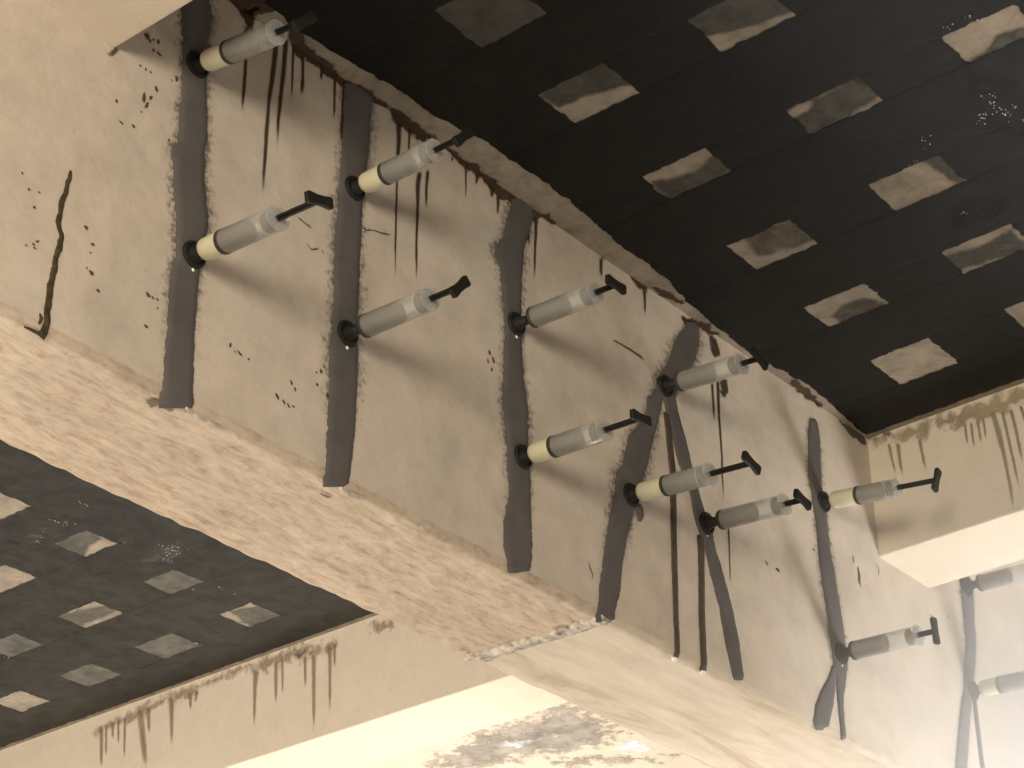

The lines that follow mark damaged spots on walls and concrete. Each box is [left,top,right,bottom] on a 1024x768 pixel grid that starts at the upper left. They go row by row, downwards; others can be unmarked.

rust [231,0,275,32]
rust [263,29,516,213]
crack [24,170,72,340]
rust [415,171,429,271]
rust [527,209,556,273]
rust [630,276,720,357]
rust [711,379,728,484]
rust [790,380,823,407]
water stain [839,388,1024,498]
water stain [99,642,336,762]